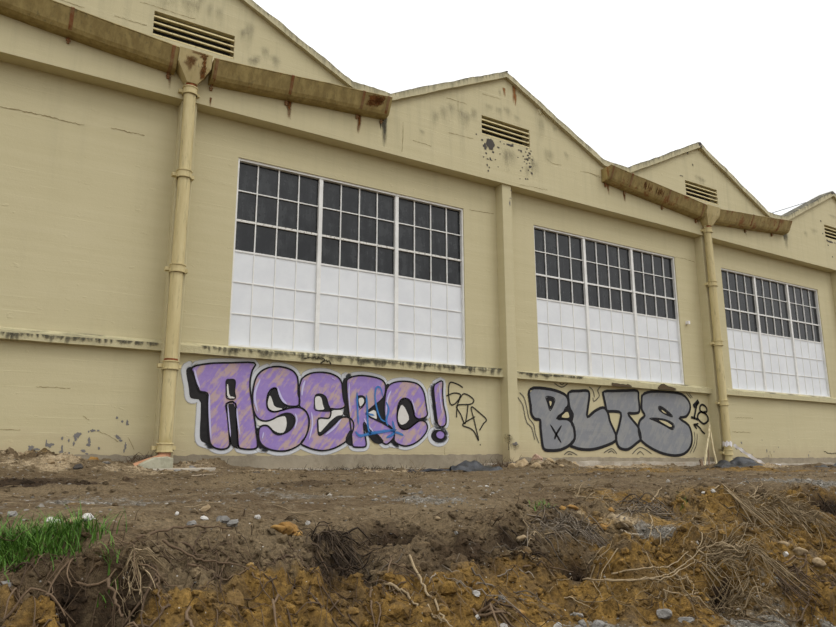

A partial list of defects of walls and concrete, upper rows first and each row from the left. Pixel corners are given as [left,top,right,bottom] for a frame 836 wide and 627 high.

rust [186,54,208,87]
rust [367,94,385,106]
crack [0,106,82,125]
peeling [476,134,533,180]
peeling [28,429,100,455]